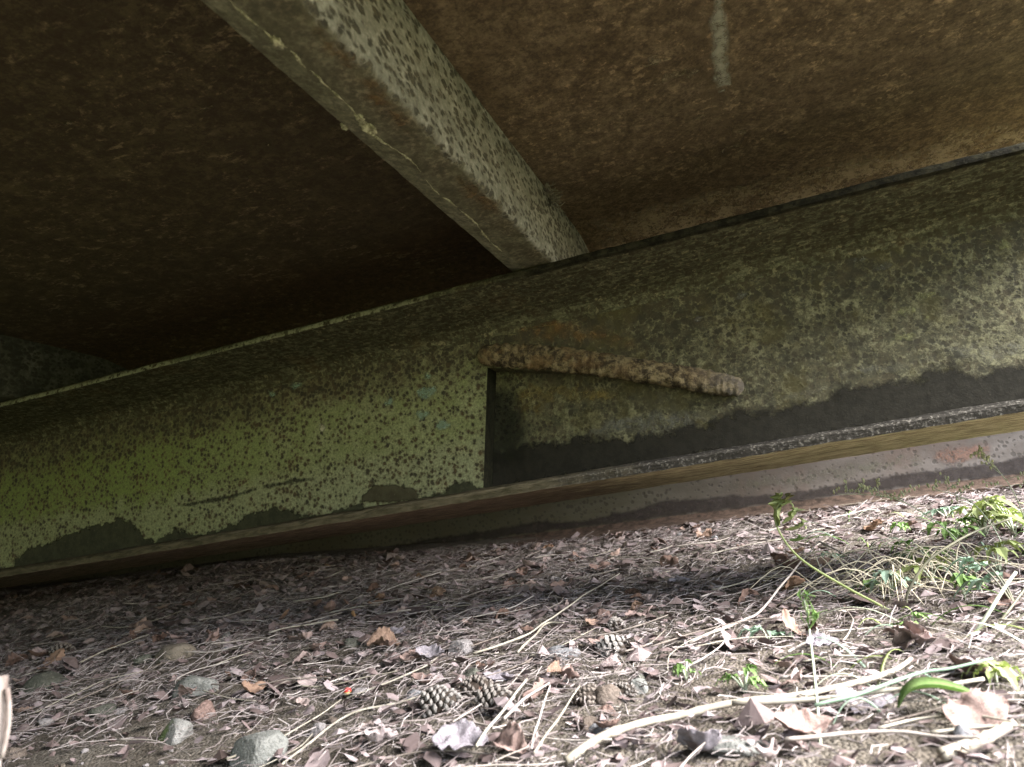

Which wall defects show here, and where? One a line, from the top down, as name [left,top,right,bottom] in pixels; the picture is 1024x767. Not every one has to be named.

damp [712,0,729,92]
damp [492,361,1024,487]